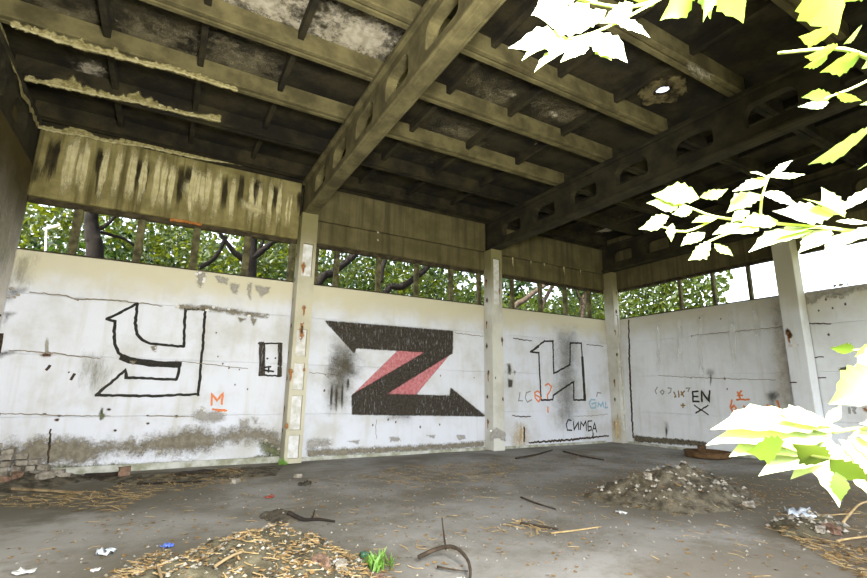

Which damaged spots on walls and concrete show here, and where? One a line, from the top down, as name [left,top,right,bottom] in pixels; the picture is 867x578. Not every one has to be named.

leakage [0,18,238,92]
leakage [224,0,398,57]
leakage [10,59,302,221]
crack [0,314,100,359]
peeling [175,304,269,325]
peeling [0,407,281,482]
leakage [256,442,280,457]